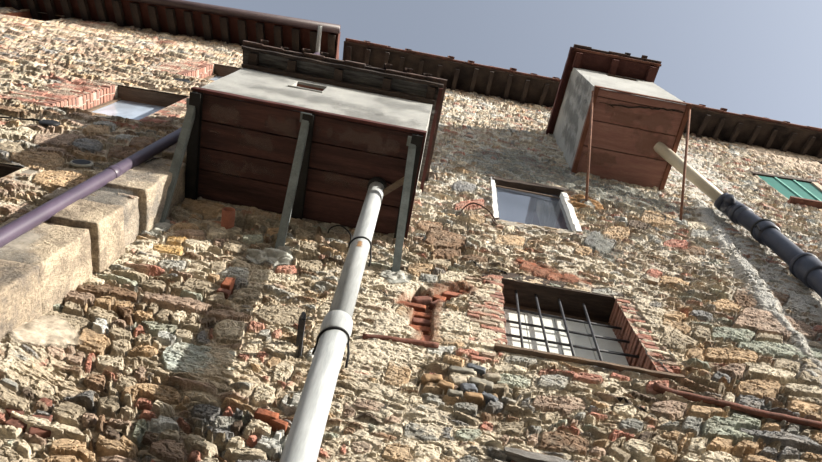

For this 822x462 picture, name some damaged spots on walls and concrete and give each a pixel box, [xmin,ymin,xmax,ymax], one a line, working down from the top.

crack [599,102,682,112]
corrosion [566,194,607,210]